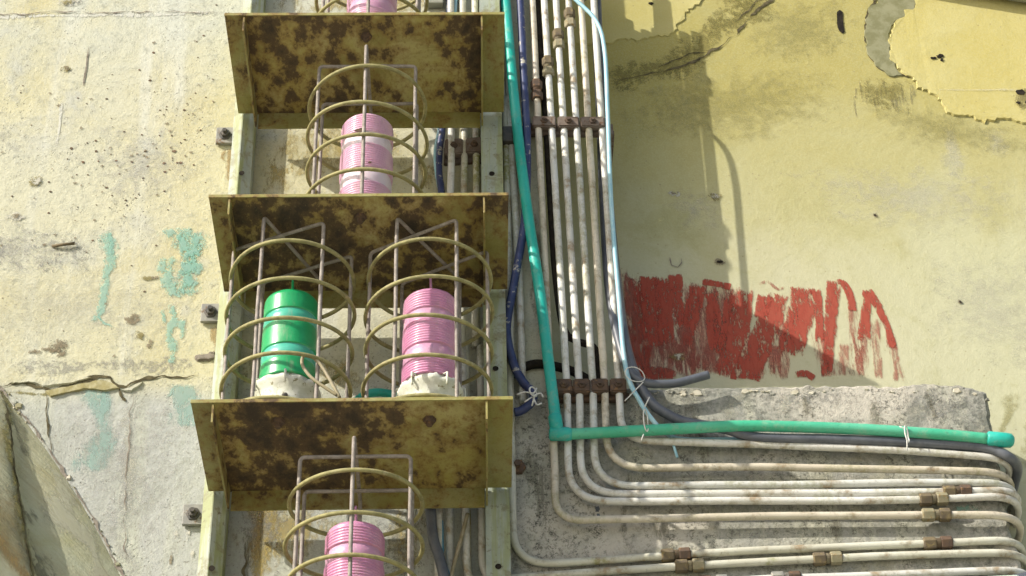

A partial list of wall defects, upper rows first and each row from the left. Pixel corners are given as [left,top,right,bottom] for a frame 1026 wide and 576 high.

crack [0,11,221,19]
crack [608,0,773,91]
crack [864,0,915,82]
peeling [888,0,1026,124]
crack [0,375,198,576]